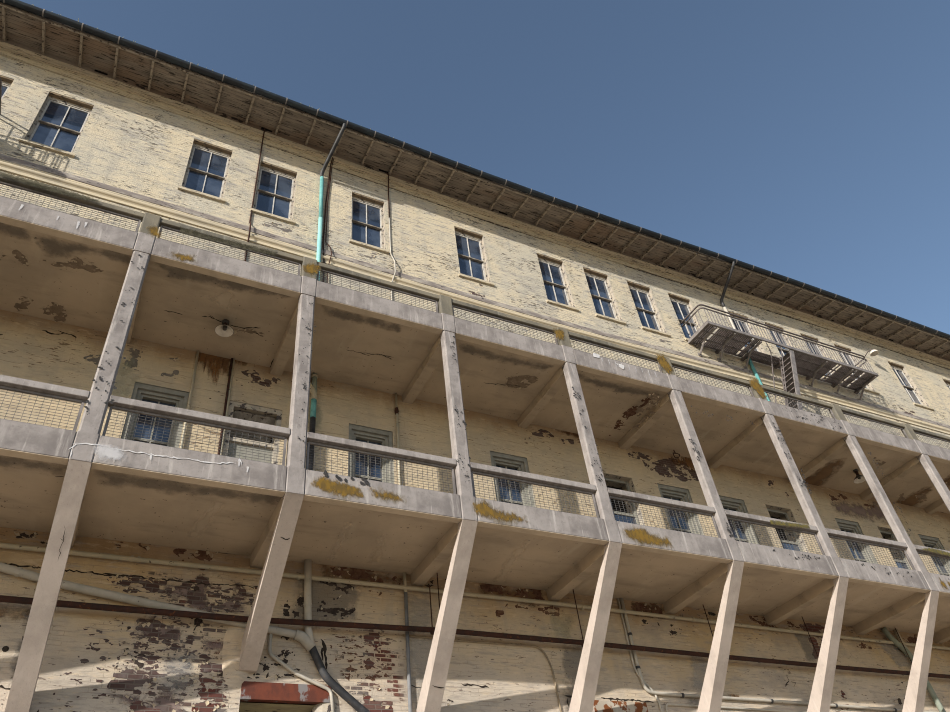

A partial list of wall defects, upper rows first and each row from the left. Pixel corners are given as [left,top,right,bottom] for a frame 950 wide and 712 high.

peeling [43,256,104,273]
peeling [123,348,143,371]
spalling [609,393,660,436]
peeling [628,452,699,482]
peeling [78,548,257,712]
peeling [749,616,825,659]
peeling [329,629,403,712]